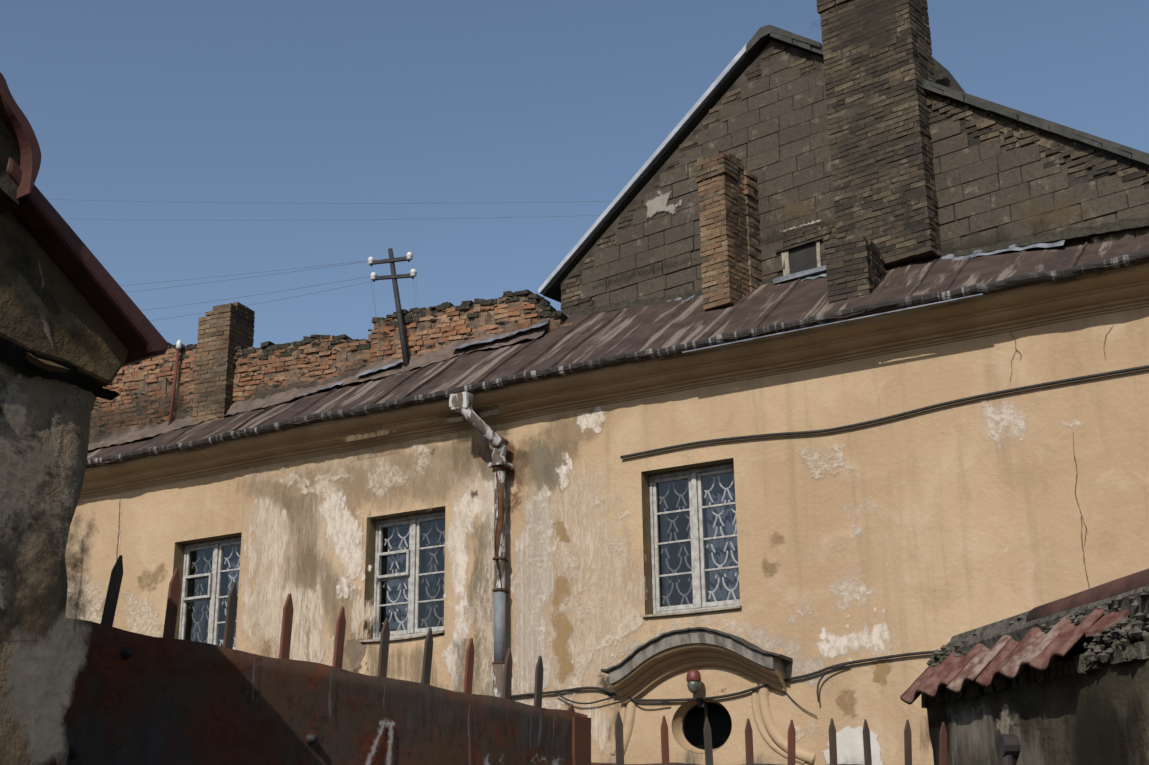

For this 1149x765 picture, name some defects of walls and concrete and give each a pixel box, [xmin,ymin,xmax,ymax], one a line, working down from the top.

flaking render [646,191,682,217]
crack [0,339,120,401]
water stain [440,405,501,424]
flaking render [577,406,605,433]
flaking render [982,402,1031,441]
crack [1073,432,1090,588]
water stain [251,413,592,705]
flaking render [0,574,106,765]
corrosion [357,719,399,765]